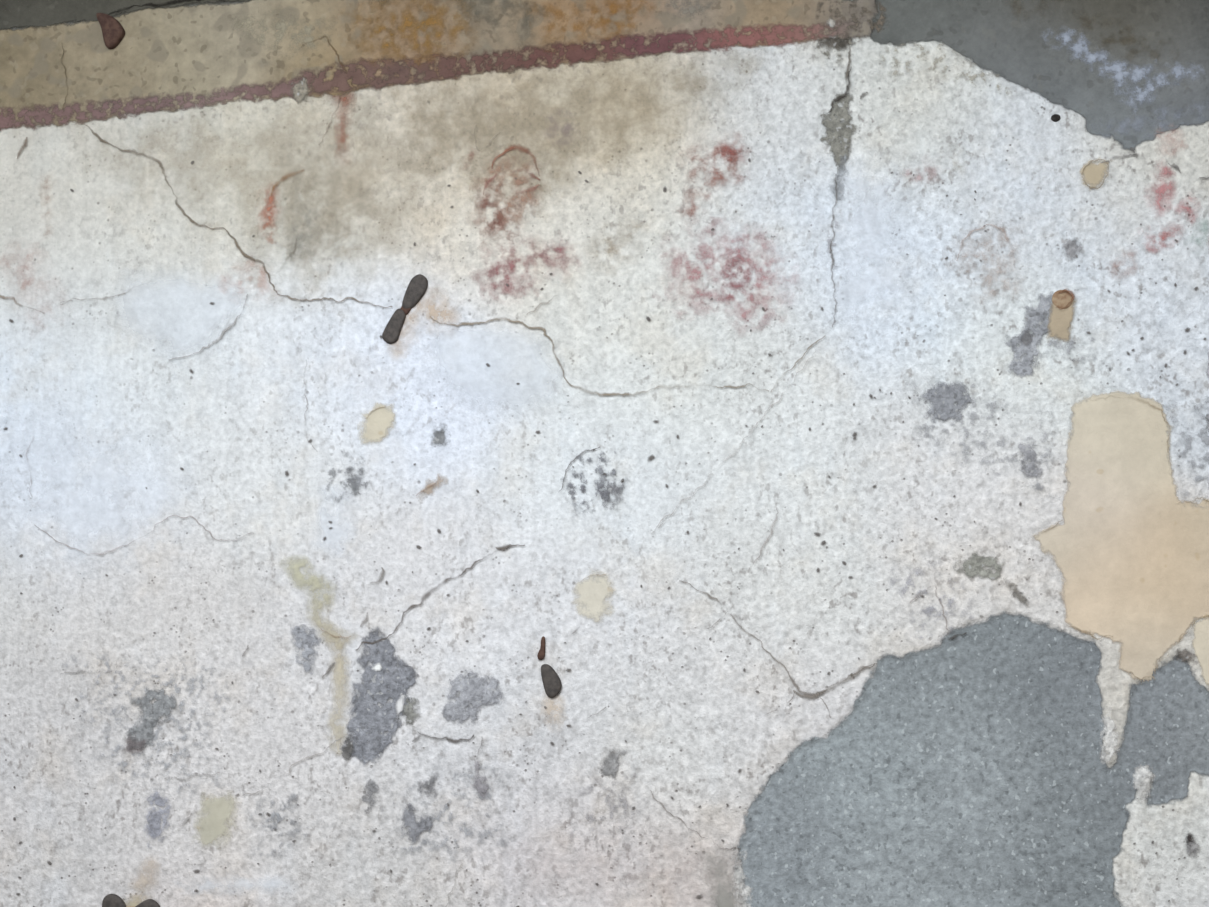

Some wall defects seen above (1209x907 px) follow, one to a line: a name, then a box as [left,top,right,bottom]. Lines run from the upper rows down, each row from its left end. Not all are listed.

peeling [293,78,309,102]
spalling [817,37,856,199]
crack [845,42,868,99]
crack [92,131,392,360]
crack [430,317,659,396]
spalling [1182,406,1209,481]
spalling [342,627,419,764]
crack [322,544,525,678]
crack [682,581,875,709]
spalling [1176,649,1195,663]
spalling [362,780,379,809]
spalling [1186,833,1199,856]